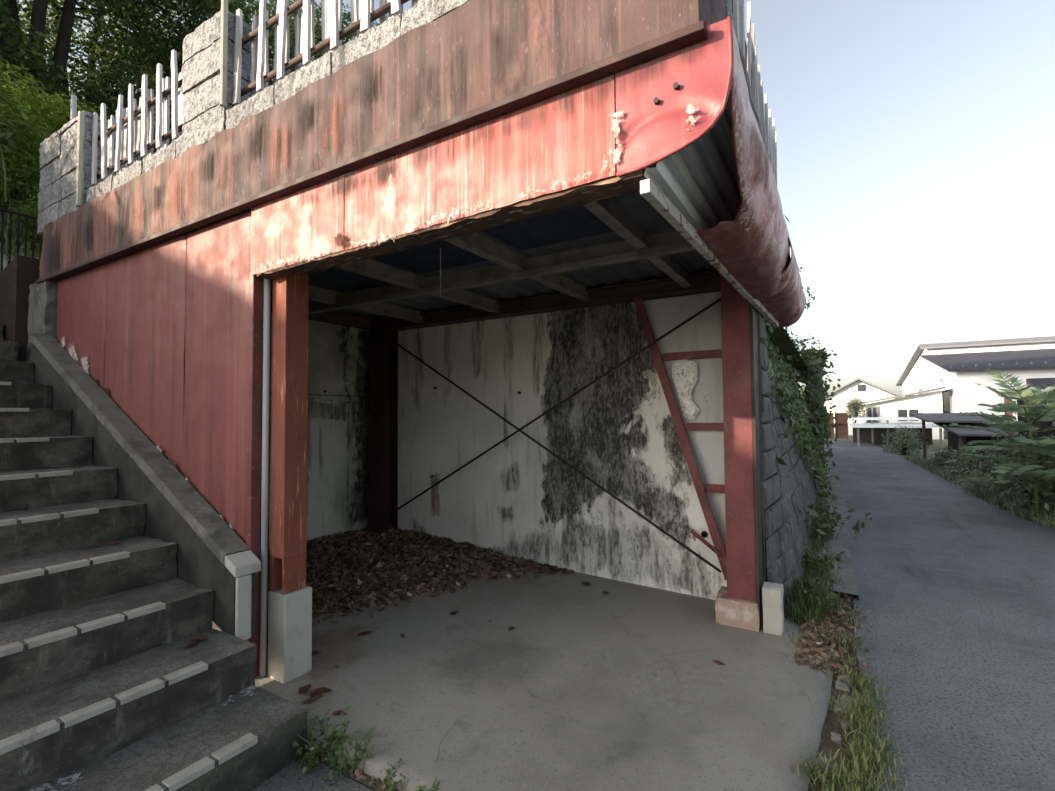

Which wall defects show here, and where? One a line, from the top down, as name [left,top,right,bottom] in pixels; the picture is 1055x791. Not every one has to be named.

corrosion [272,126,287,167]
peeling [518,111,624,198]
peeling [686,103,700,130]
peeling [350,199,492,246]
peeling [260,248,330,272]
spalling [672,359,699,419]
damp [337,326,369,529]
damp [495,302,720,597]